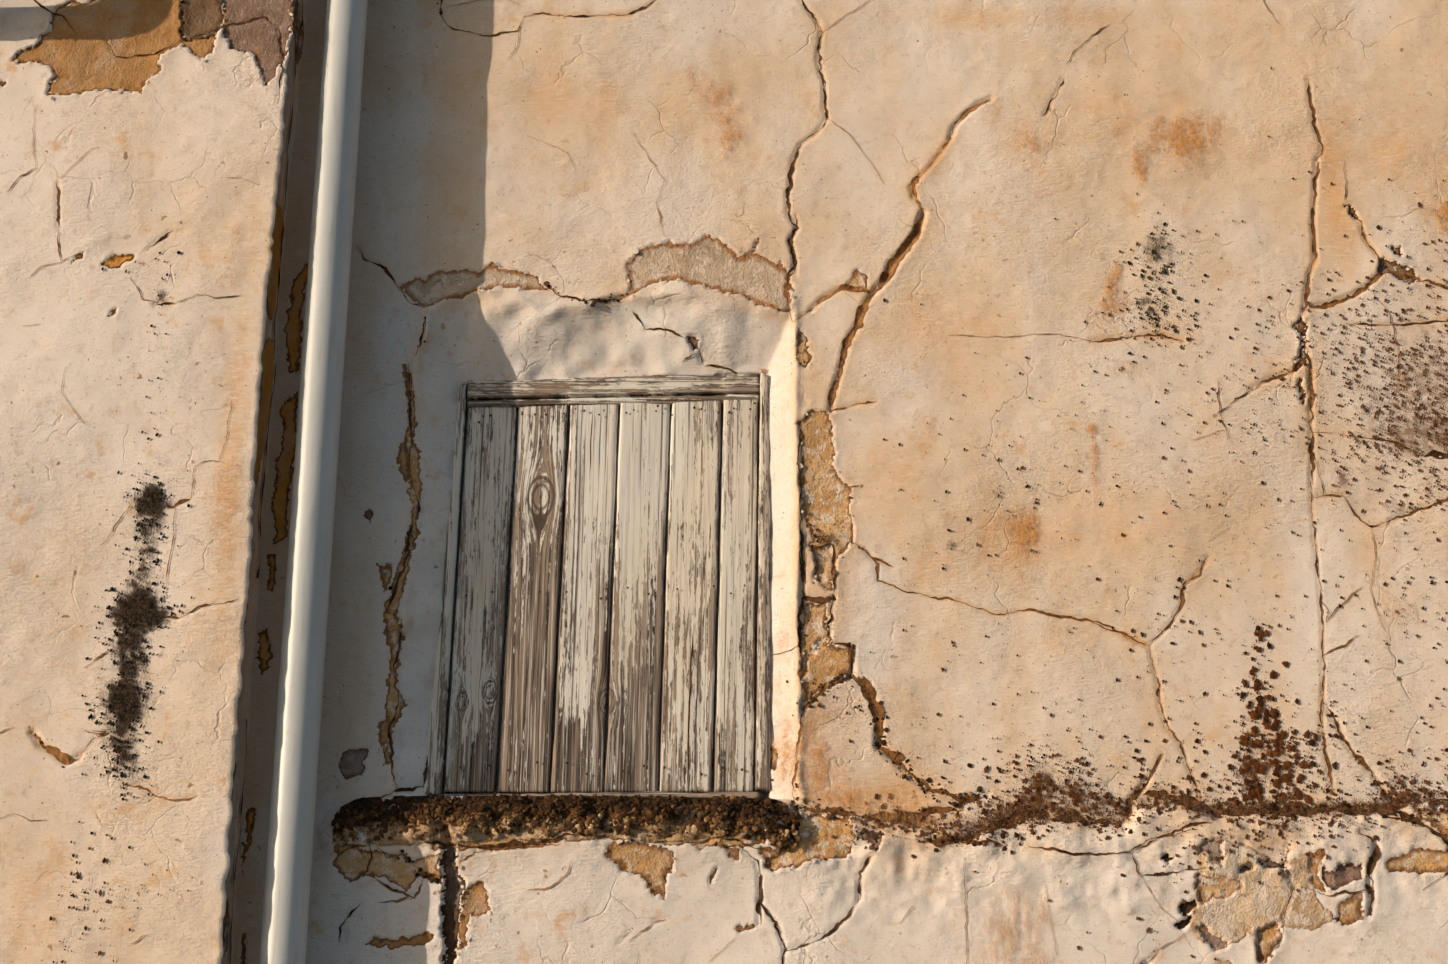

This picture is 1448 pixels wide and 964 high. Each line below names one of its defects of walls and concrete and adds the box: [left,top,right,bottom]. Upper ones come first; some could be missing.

peeling [11,0,304,101]
crack [437,0,655,59]
crack [543,281,737,374]
damp [49,370,199,963]
peeling [338,364,423,780]
crack [357,247,428,798]
peeling [797,409,854,703]
crack [710,0,1448,964]
damp [771,176,1448,913]
crack [335,830,592,939]
spalling [333,813,882,964]
peeling [1174,837,1365,964]